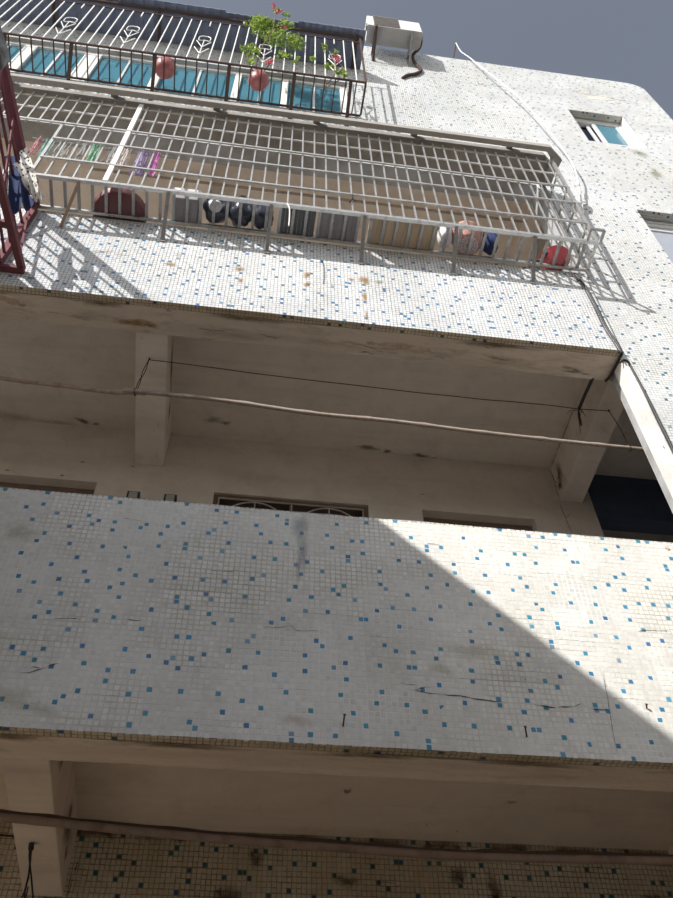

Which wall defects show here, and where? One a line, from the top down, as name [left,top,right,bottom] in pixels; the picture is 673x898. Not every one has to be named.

crack [401,682,505,703]
crack [538,676,616,745]